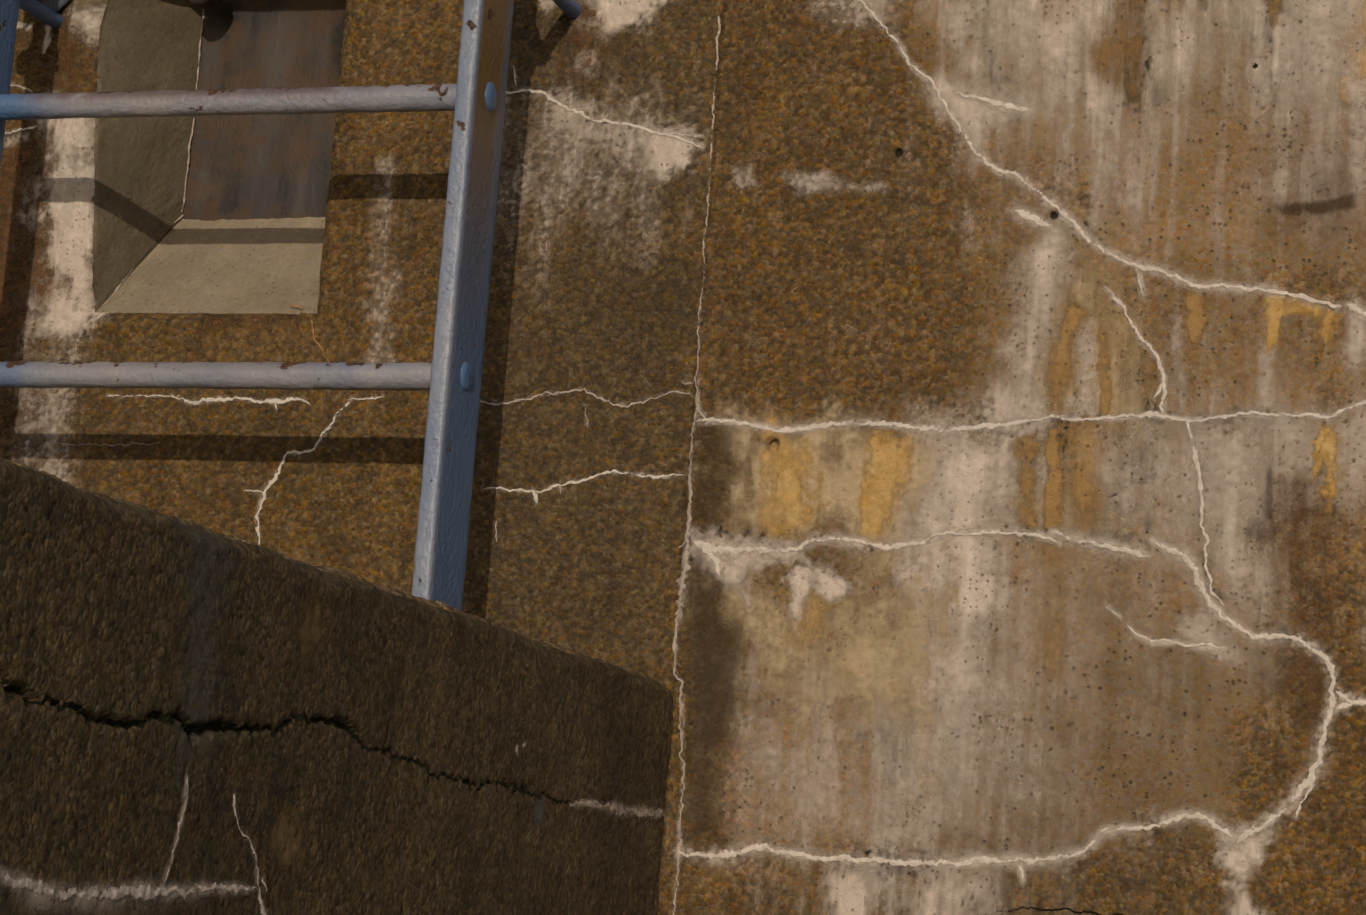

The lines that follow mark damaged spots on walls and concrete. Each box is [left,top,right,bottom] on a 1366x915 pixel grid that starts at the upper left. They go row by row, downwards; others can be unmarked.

crack [175,9,205,223]
damp [1280,0,1366,213]
efflorescence [3,118,109,338]
crack [107,394,385,545]
crack [288,304,331,363]
crack [480,0,1366,915]
damp [1013,227,1160,563]
damp [1172,290,1209,364]
damp [1264,294,1339,350]
crack [0,775,267,915]
crack [0,663,665,818]
damp [695,400,993,915]